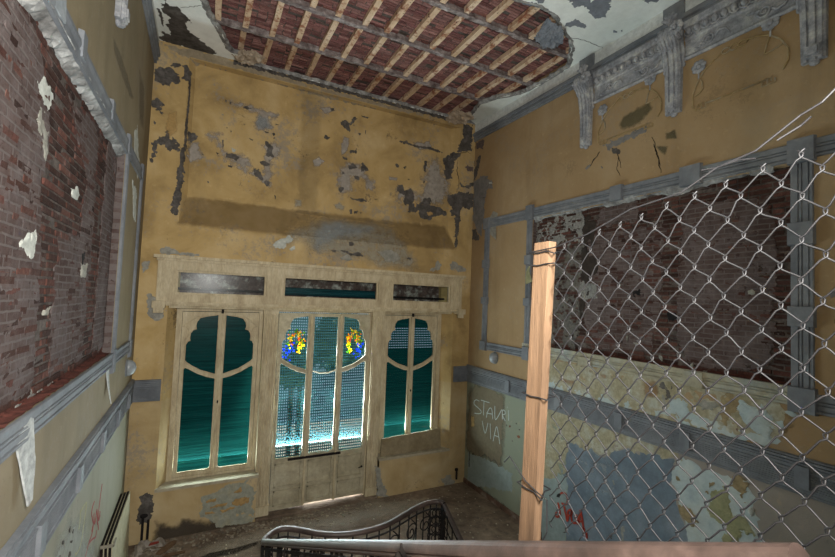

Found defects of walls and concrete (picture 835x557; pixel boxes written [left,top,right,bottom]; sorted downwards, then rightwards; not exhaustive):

peeling [150,0,449,215]
flaking render [0,0,140,506]
peeling [146,293,167,321]
spalling [525,165,791,385]
peeling [549,359,799,446]
peeling [199,479,257,528]
peeling [541,409,764,542]